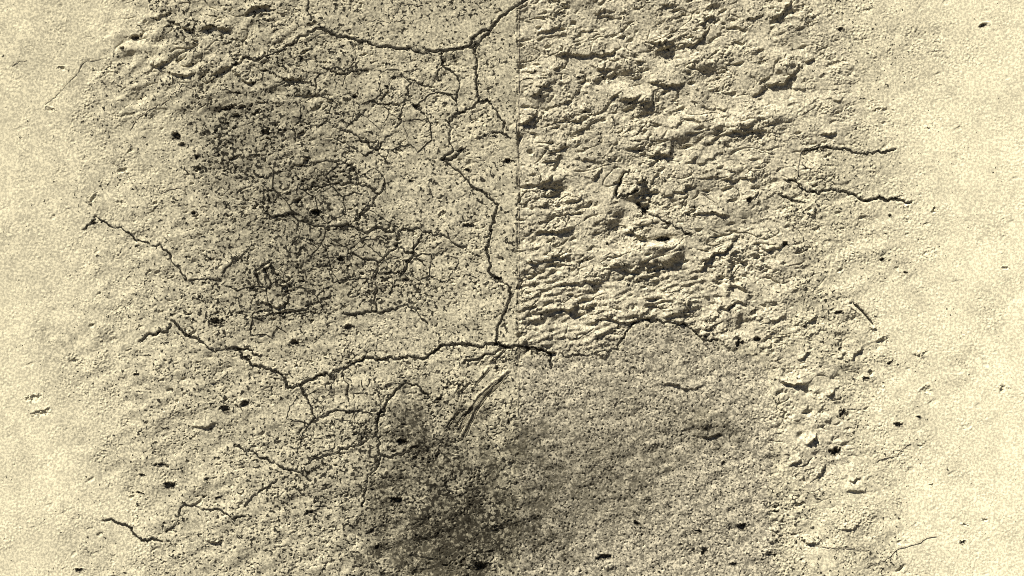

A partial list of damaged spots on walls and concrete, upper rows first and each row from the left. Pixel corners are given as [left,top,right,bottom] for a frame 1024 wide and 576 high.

crack [83,0,715,542]
leakage [355,349,577,576]
flaking render [503,0,865,492]
crack [781,146,911,204]